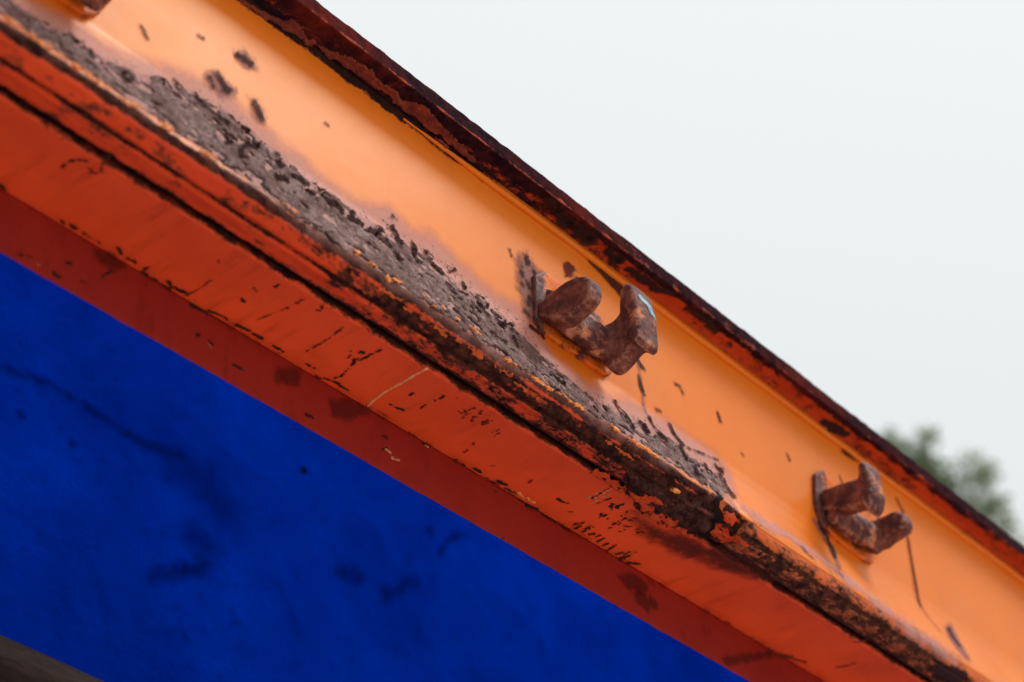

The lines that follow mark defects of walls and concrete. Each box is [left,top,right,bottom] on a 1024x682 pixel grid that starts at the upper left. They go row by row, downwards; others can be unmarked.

peeling [2,14,142,108]
peeling [236,0,477,163]
corrosion [0,0,737,499]
peeling [116,247,285,353]
peeling [354,249,483,360]
peeling [305,349,382,391]
peeling [494,357,589,413]
peeling [605,424,661,461]
peeling [454,459,644,565]
peeling [705,486,750,547]
corrosion [814,519,842,576]
corrosion [907,536,922,608]